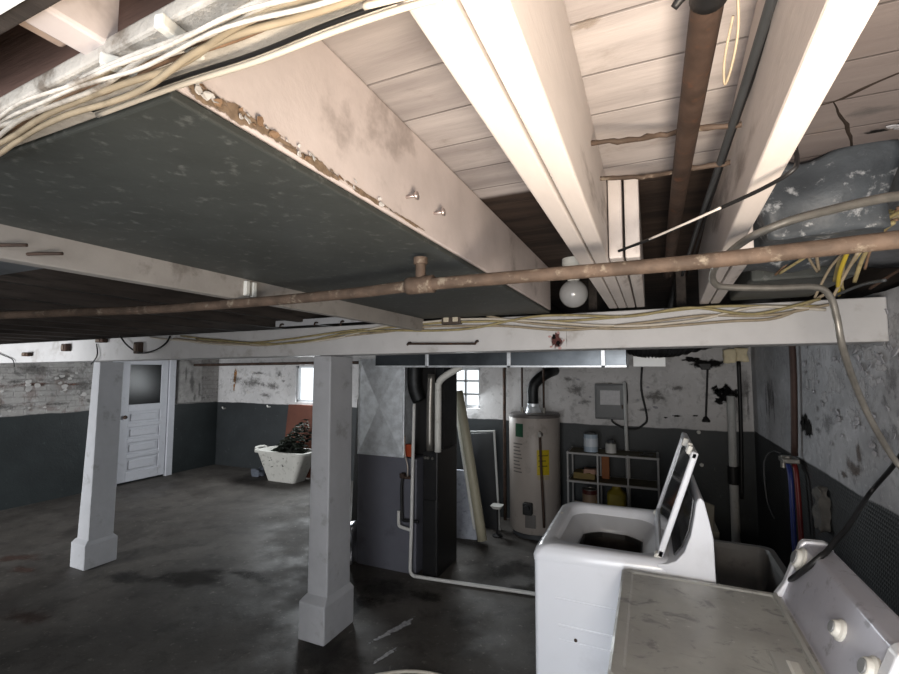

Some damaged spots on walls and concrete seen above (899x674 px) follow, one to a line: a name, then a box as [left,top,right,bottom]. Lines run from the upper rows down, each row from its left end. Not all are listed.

peeling [188,82,425,231]
crack [820,72,899,146]